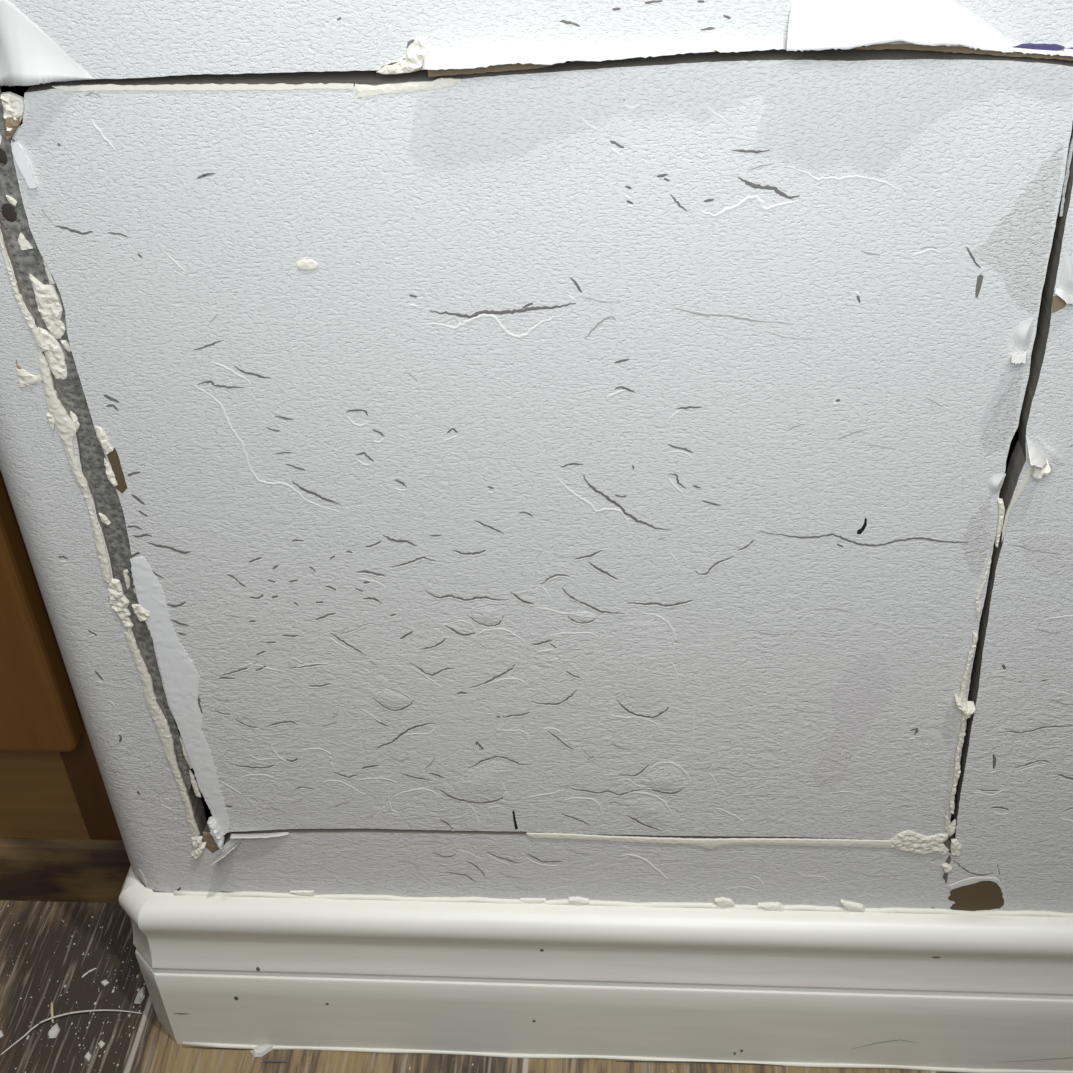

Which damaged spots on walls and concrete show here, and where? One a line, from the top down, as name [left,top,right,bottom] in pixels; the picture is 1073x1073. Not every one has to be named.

peeling [0,0,93,86]
peeling [422,0,1073,70]
crack [430,278,617,338]
peeling [1054,288,1073,305]
peeling [17,369,42,388]
crack [198,365,270,389]
peeling [1011,353,1026,364]
crack [267,416,341,505]
crack [560,463,670,539]
crack [197,512,1062,730]
crack [503,640,682,833]
crack [236,690,591,890]